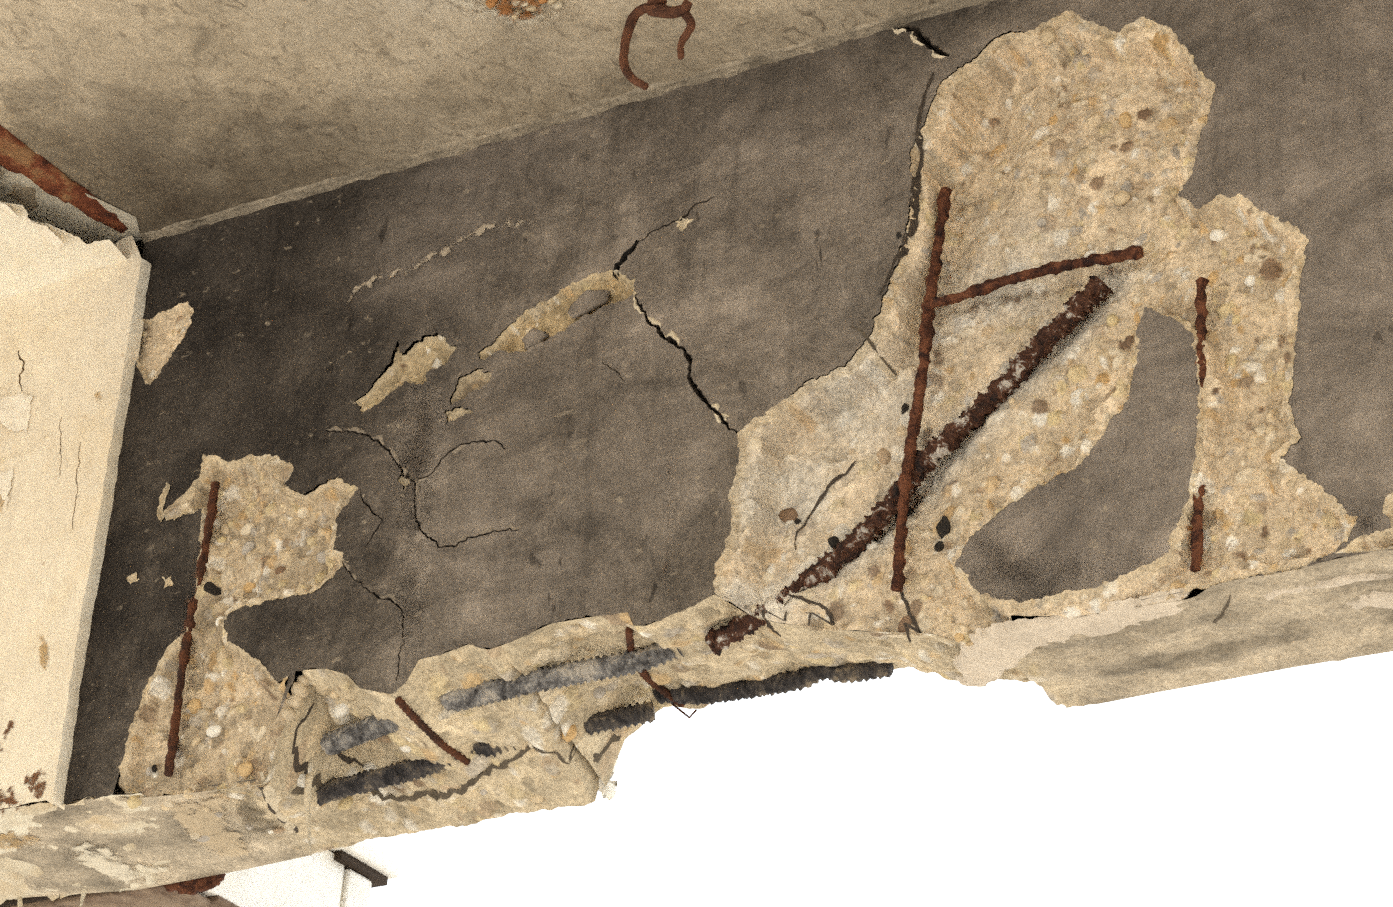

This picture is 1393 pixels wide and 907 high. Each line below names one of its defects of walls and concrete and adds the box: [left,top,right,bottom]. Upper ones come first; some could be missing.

rust [484,0,564,20]
rust [0,125,128,233]
peeling [0,393,33,432]
spalling [136,301,194,384]
spalling [356,334,457,413]
spalling [446,270,636,422]
crack [613,197,738,433]
spalling [713,10,1393,645]
crack [326,426,518,681]
spalling [118,454,358,857]
spalling [598,758,618,800]